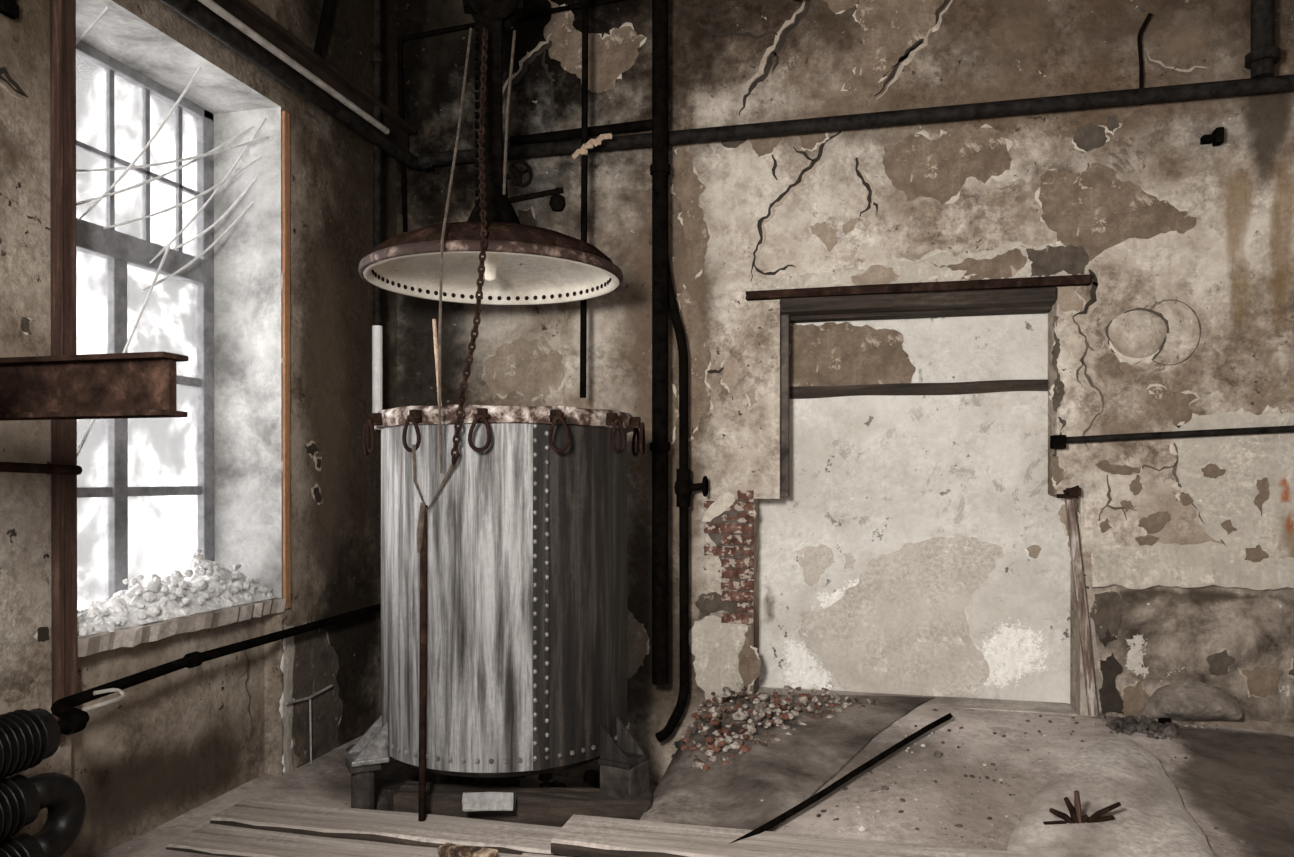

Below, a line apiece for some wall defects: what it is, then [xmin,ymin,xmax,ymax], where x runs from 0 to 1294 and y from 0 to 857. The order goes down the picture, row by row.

crack [0,67,28,100]
flaking render [543,0,647,93]
crack [697,0,811,116]
crack [874,0,953,99]
leakage [1246,92,1288,166]
crack [751,130,878,282]
flaking render [751,116,1197,489]
crack [1070,268,1104,449]
spalling [689,490,761,702]
flaking render [795,534,1004,697]
flaking render [1024,543,1042,559]
spalling [1058,383,1294,723]